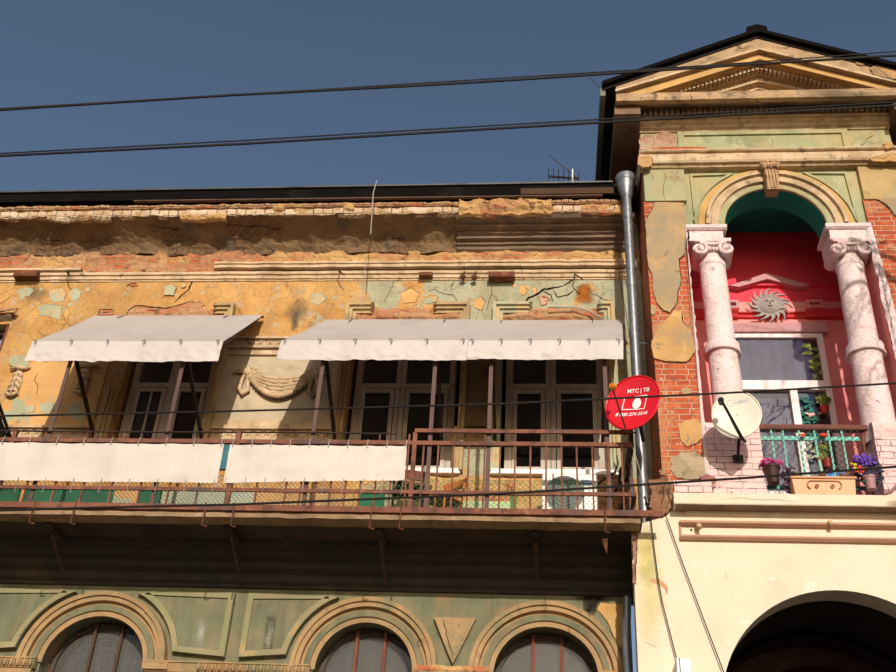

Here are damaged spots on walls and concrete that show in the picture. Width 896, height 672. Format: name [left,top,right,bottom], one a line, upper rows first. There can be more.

flaking render [869,142,896,163]
spalling [47,214,112,224]
spalling [180,213,227,223]
flaking render [877,199,896,216]
peeling [0,287,90,319]
flaking render [126,283,206,316]
peeling [309,293,337,305]
crack [525,280,613,303]
flaking render [645,202,695,363]